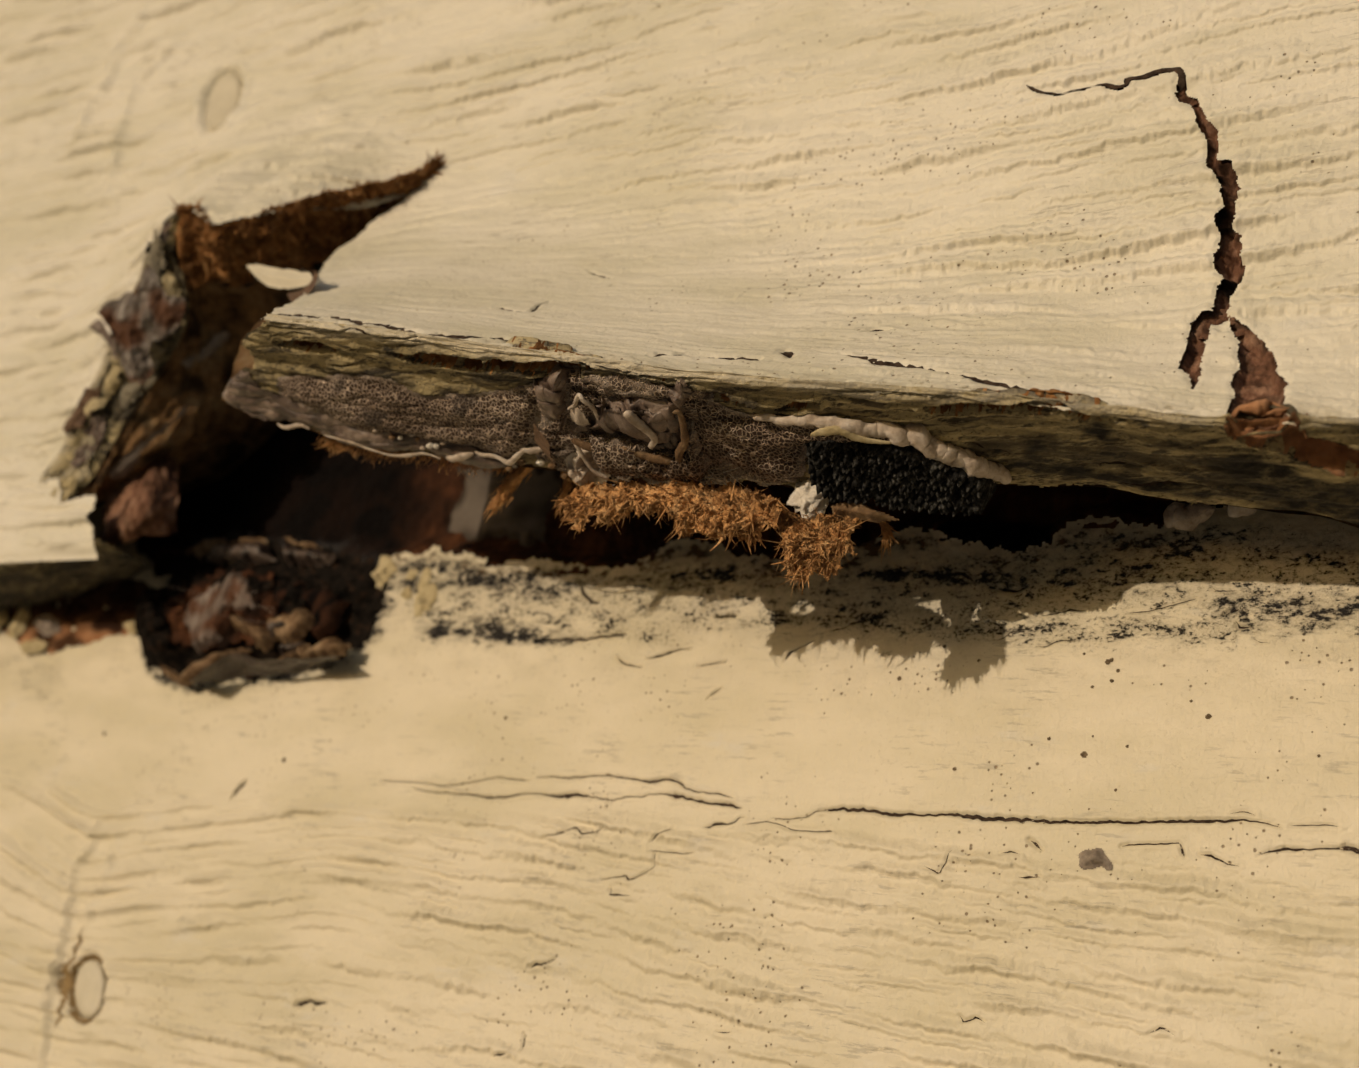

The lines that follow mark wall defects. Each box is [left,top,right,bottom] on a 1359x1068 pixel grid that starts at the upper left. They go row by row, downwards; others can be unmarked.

crack [1026,67,1248,389]
peeling [49,222,185,503]
spalling [1211,313,1359,477]
peeling [448,423,573,547]
leakage [140,650,214,694]
peeling [371,555,438,617]
leakage [161,525,1359,685]
crack [389,774,1359,896]